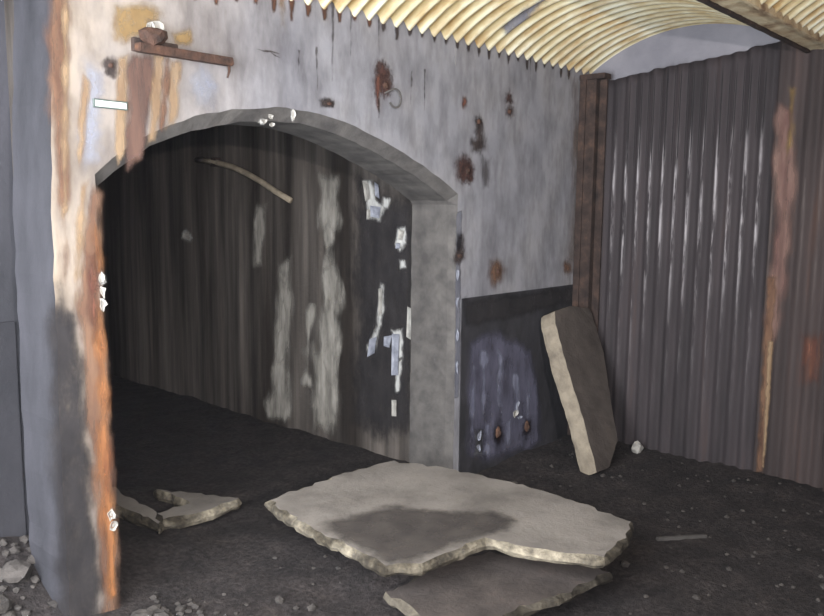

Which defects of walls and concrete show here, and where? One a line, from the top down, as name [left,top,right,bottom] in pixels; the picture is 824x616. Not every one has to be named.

rust [115,6,158,41]
rust [46,0,70,214]
rust [78,77,89,159]
rust [105,55,181,168]
rust [374,62,392,112]
rust [456,118,488,184]
peeling [362,181,389,219]
peeling [395,228,406,250]
rust [490,261,502,285]
rust [756,105,797,472]
peeling [367,286,411,416]
rust [75,186,118,613]